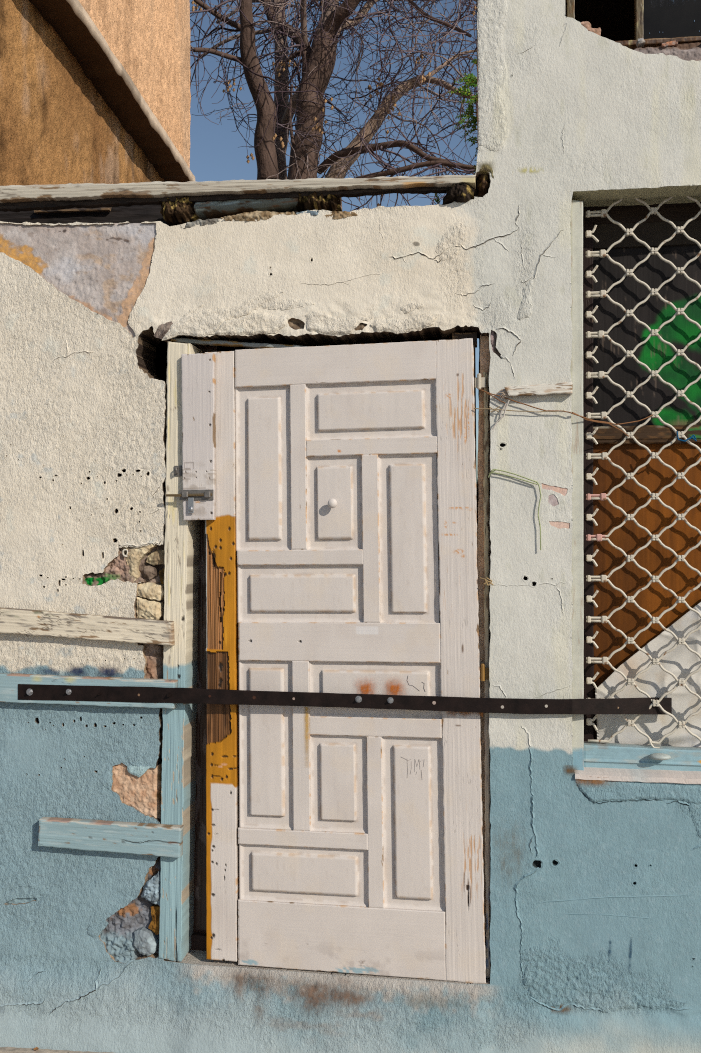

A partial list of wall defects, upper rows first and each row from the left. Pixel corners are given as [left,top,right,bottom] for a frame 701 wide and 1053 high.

flaking render [633,42,701,61]
peeling [0,223,156,338]
crack [301,205,563,378]
flaking render [84,544,165,620]
flaking render [101,755,162,819]
flaking render [87,856,161,963]
crack [514,726,607,1011]
crack [0,959,135,1015]